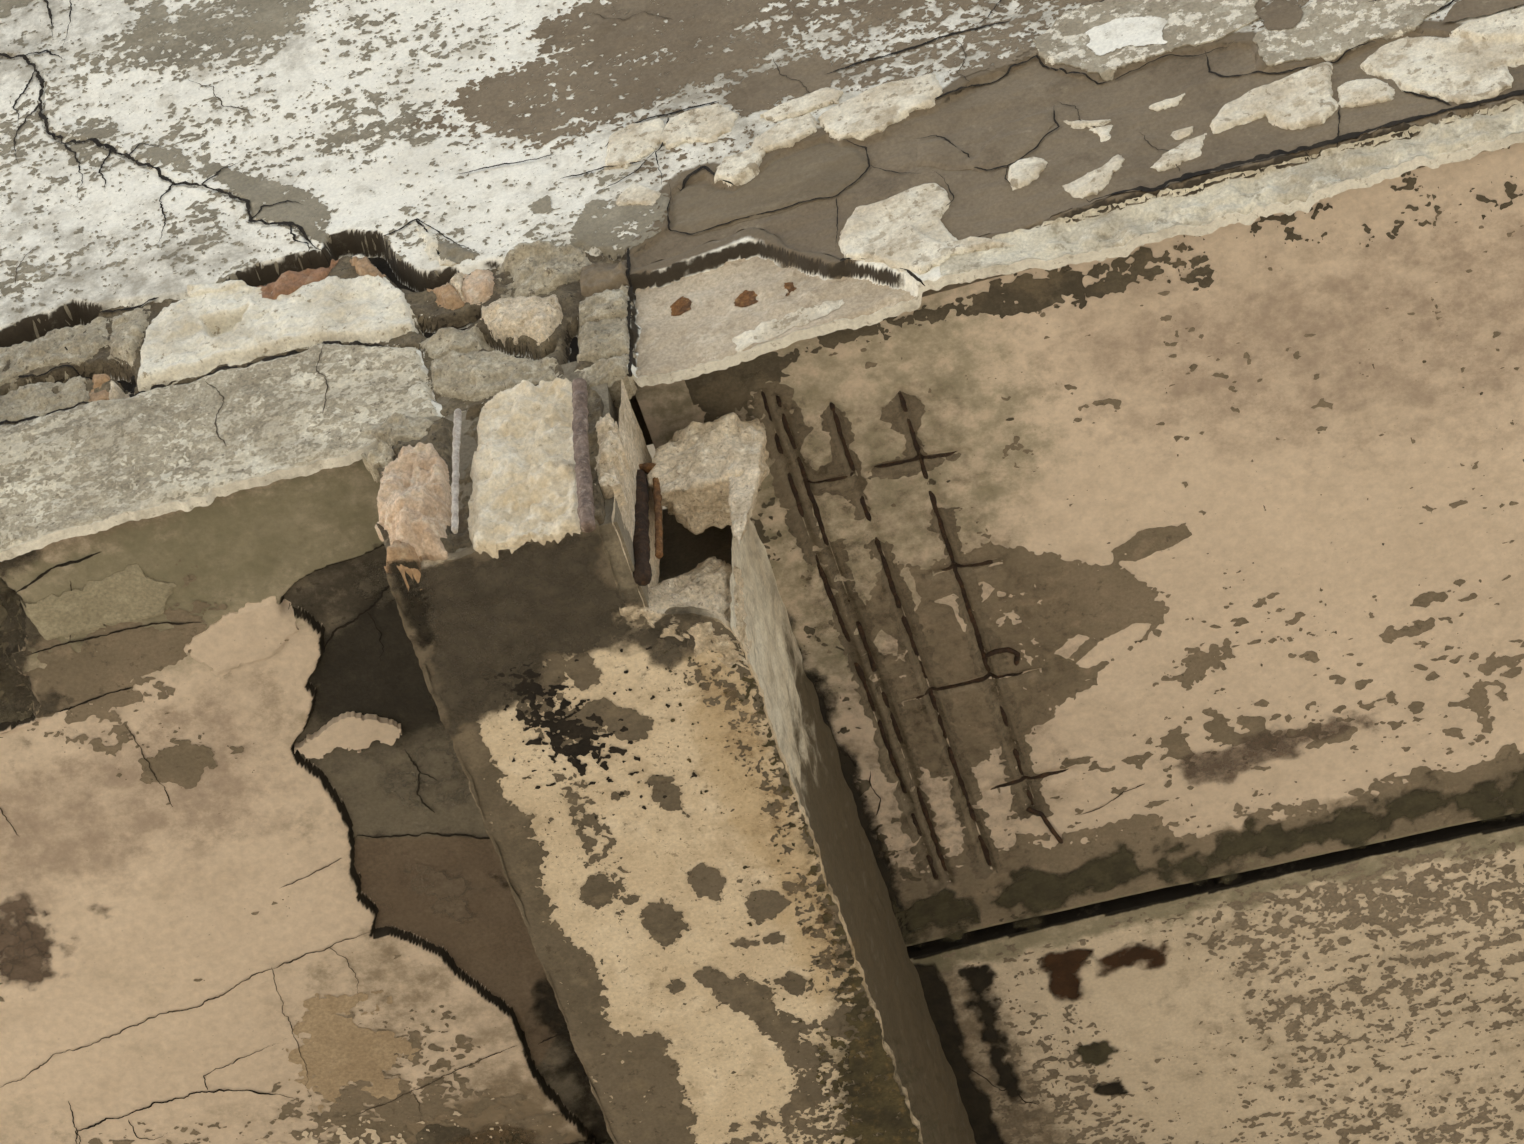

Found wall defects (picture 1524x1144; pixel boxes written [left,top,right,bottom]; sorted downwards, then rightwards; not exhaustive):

crack [0,0,477,292]
crack [456,0,1375,261]
crack [625,248,634,377]
peeling [0,343,436,549]
spalling [633,463,663,586]
spalling [16,559,254,789]
peeling [685,235,1524,1144]
leakage [0,894,54,985]
crack [2,932,369,1144]
spalling [88,545,921,1144]
leakage [387,535,934,1144]
corrosion [1040,943,1167,1001]